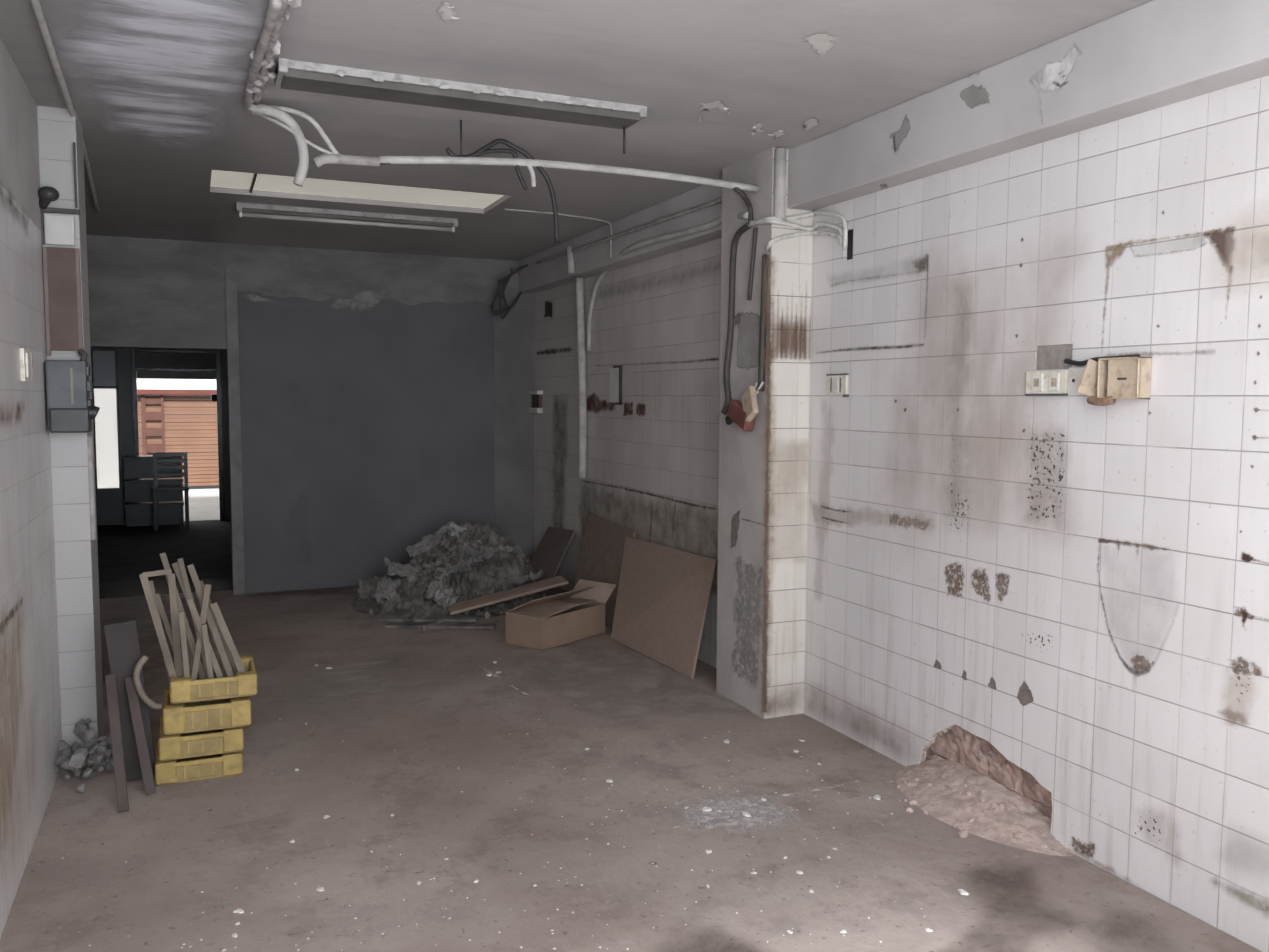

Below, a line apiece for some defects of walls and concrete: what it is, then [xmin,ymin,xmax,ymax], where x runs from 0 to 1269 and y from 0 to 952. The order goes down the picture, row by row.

peeling [960,71,989,108]
peeling [1033,47,1080,91]
peeling [890,116,910,153]
rust [762,249,806,712]
mould [1027,433,1065,518]
damp [1099,539,1164,549]
damp [1116,650,1150,675]
flaking render [925,726,1052,819]